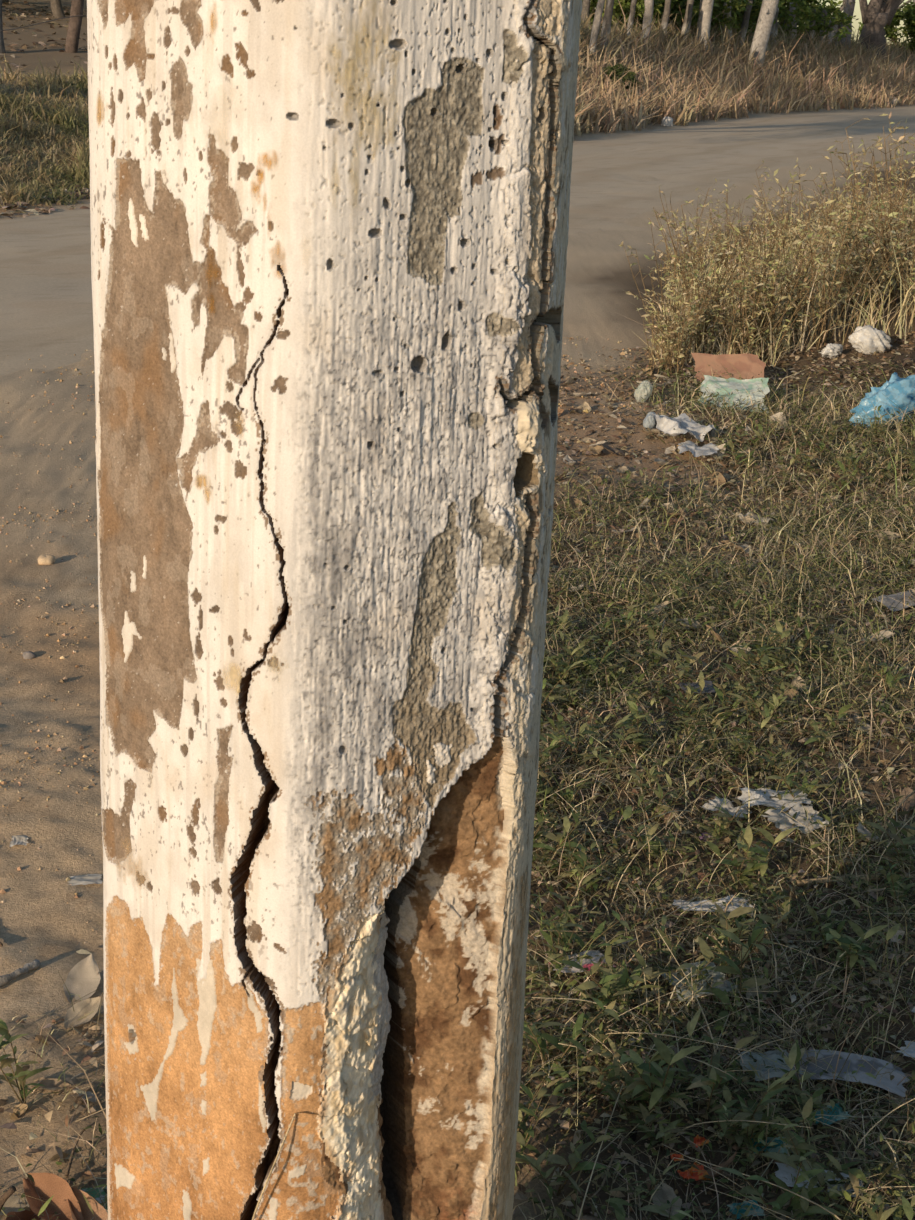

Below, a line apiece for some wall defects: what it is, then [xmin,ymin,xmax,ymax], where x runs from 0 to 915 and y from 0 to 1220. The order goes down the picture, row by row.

peeling [241,0,284,17]
crack [534,38,556,141]
spalling [326,119,355,130]
peeling [383,0,561,396]
spalling [368,227,382,238]
peeling [276,330,291,340]
spalling [372,343,427,376]
peeling [271,375,288,395]
crack [518,380,535,400]
peeling [92,0,274,865]
crack [230,265,290,1220]
spalling [105,492,529,1220]